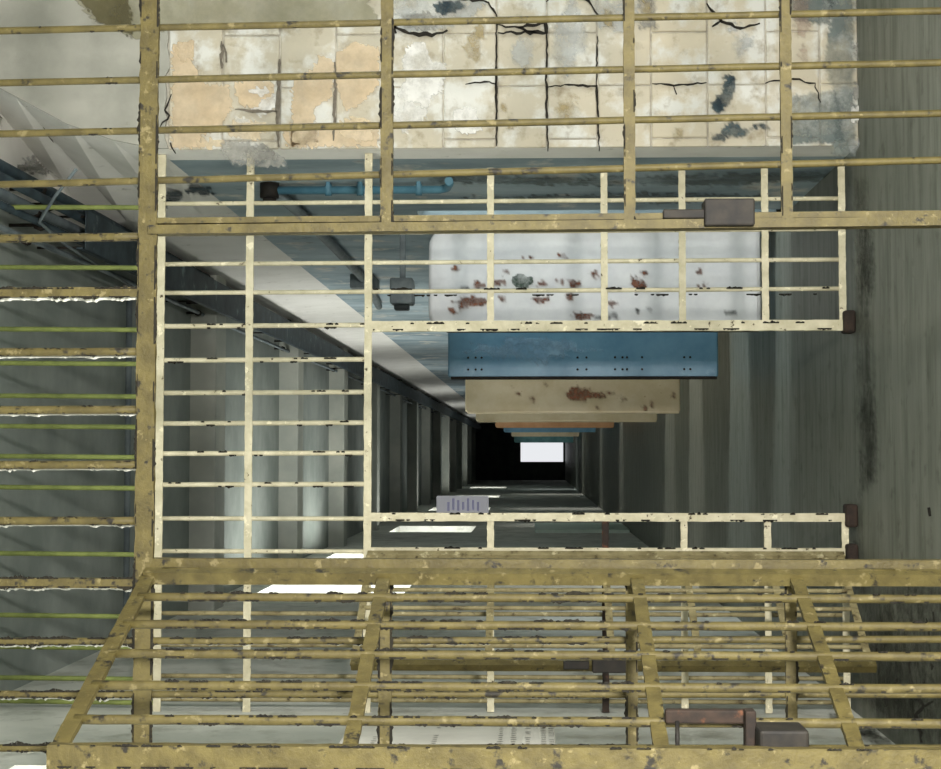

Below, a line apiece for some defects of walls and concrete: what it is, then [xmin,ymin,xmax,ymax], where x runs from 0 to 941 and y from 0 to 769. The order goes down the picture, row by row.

crack [394,26,448,37]
crack [706,3,760,30]
peeling [155,0,485,211]
crack [463,0,600,151]
crack [652,82,707,95]
damp [711,74,736,113]
damp [712,121,769,141]
peeling [0,238,139,332]
rust [448,271,508,314]
rust [538,280,581,300]
rust [631,271,648,288]
peeling [150,585,247,675]